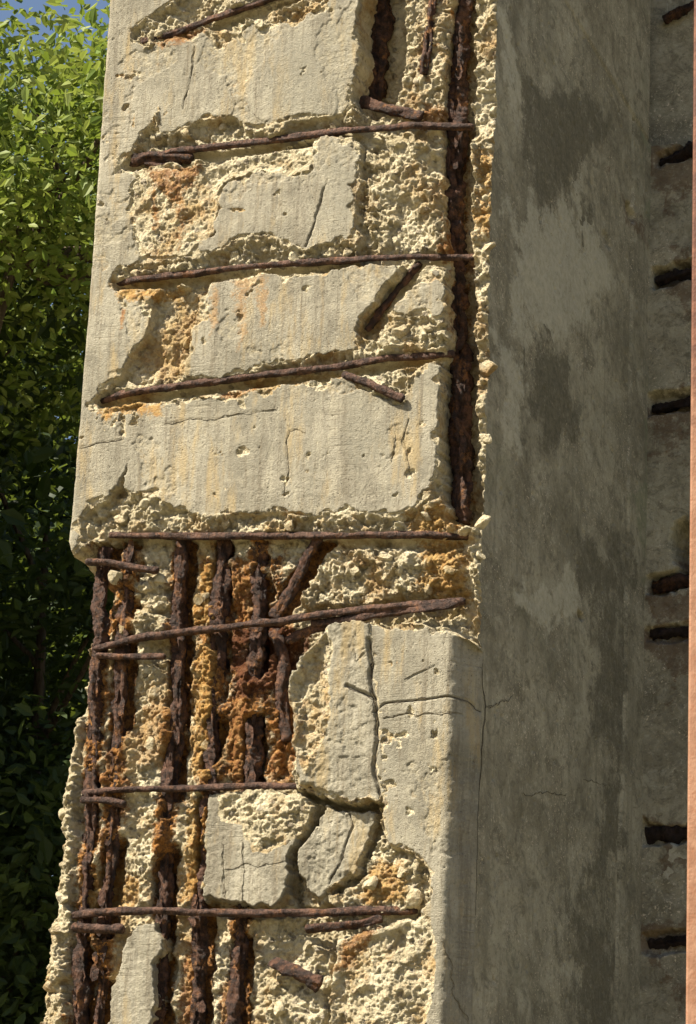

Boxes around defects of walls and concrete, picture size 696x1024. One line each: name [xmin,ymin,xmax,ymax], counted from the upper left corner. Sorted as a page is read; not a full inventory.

corrosion [92,396,172,424]
corrosion [106,282,194,334]
corrosion [131,151,207,256]
spalling [40,0,498,1024]
corrosion [433,114,494,279]
damp [487,0,625,481]
corrosion [77,496,481,909]
crack [348,640,512,915]
damp [510,405,687,1024]
corrosion [644,548,690,710]
corrosion [171,932,230,1024]
corrosion [640,798,687,1024]